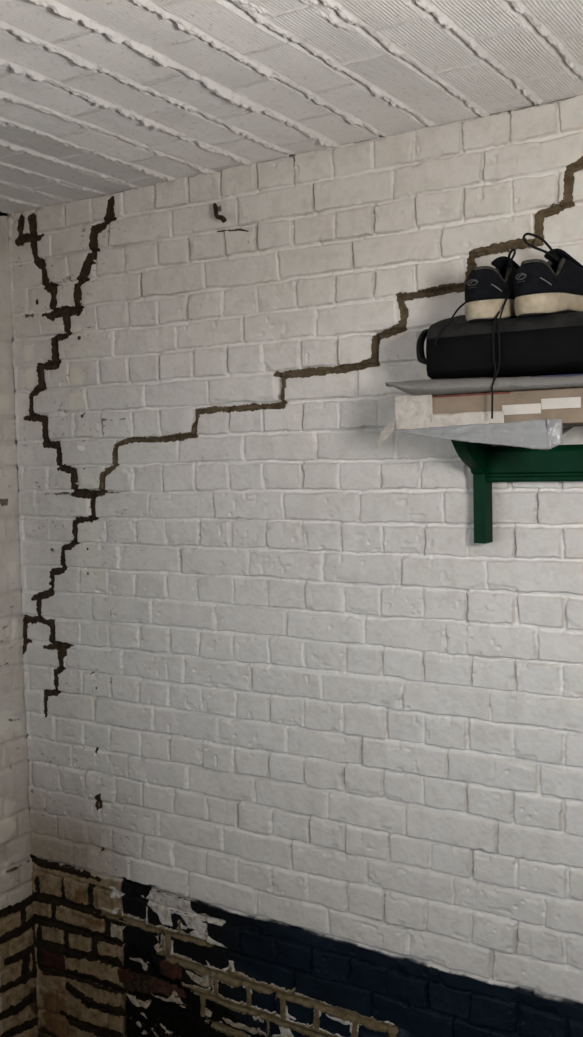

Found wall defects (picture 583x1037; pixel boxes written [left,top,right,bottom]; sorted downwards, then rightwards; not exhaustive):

crack [0,156,583,717]
peeling [98,886,410,1037]